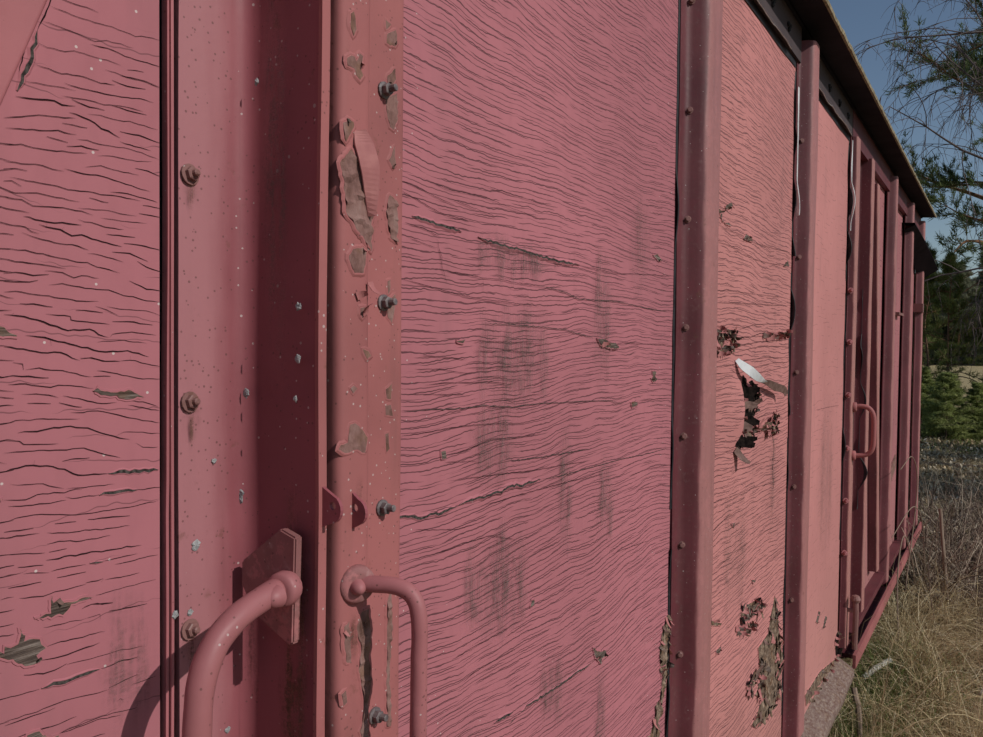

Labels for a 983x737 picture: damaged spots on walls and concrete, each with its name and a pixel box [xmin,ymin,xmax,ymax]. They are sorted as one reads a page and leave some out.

peeling [343,8,365,84]
peeling [336,66,400,326]
crack [0,0,162,737]
crack [400,177,671,555]
crack [718,290,789,374]
peeling [763,329,793,341]
crack [713,412,778,531]
peeling [338,594,394,737]
crack [494,662,592,724]